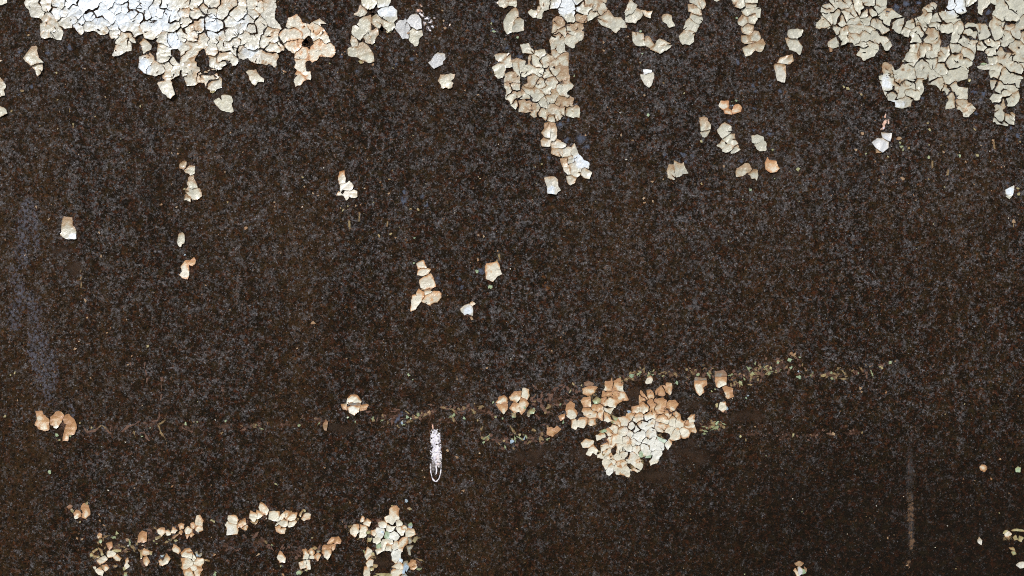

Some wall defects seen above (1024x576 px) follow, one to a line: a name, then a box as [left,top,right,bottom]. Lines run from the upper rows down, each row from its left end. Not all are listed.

peeling [23,0,423,116]
peeling [490,0,765,194]
peeling [816,0,1024,131]
rust [83,413,167,444]
rust [366,403,497,428]
rust [470,384,587,450]
peeling [503,352,801,477]
rust [620,366,714,400]
rust [699,420,832,441]
rust [728,353,884,387]
peeling [67,501,311,576]
peeling [277,499,419,576]